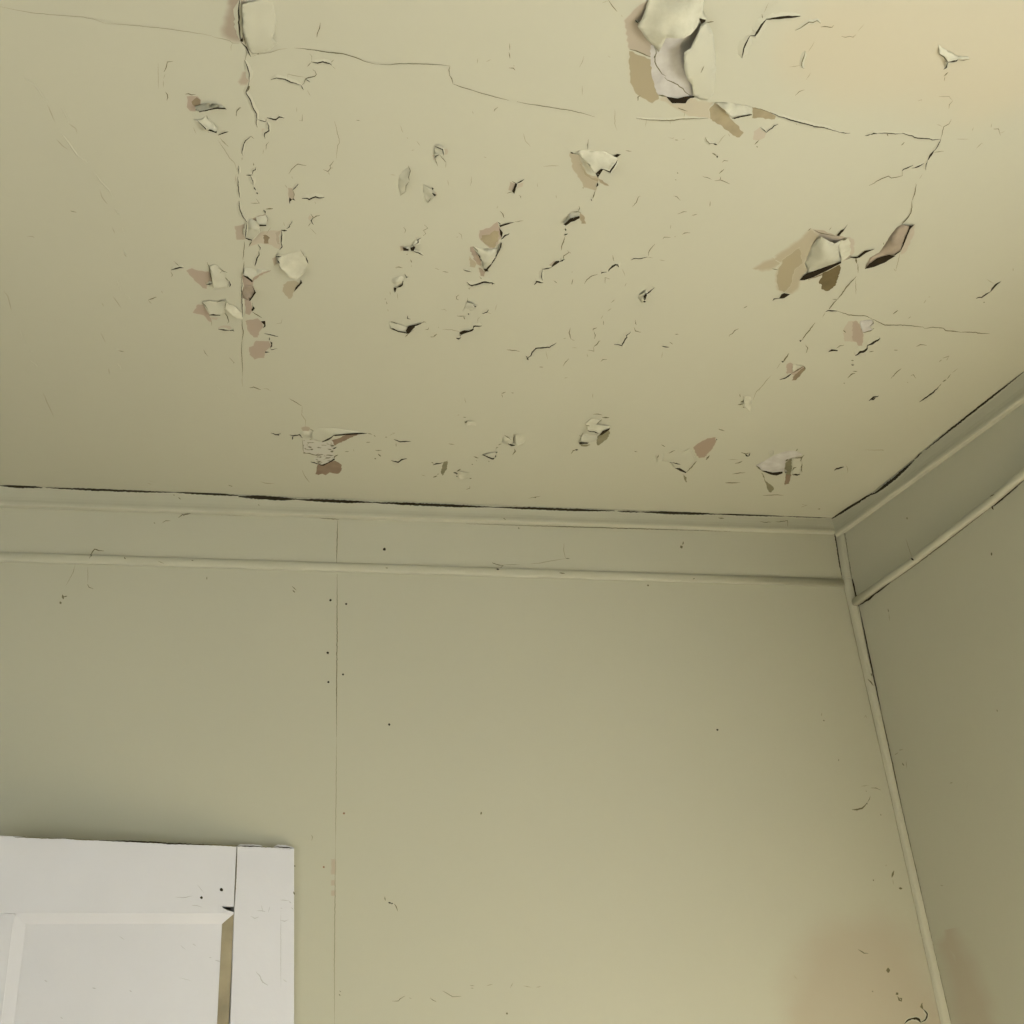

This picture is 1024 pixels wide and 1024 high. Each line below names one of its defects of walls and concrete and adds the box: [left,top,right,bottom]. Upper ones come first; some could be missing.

peeling [186,208,309,360]
crack [4,0,616,390]
peeling [469,206,519,276]
peeling [561,144,621,250]
peeling [623,0,778,147]
crack [672,136,730,184]
peeling [751,218,915,300]
crack [737,7,1003,221]
crack [753,277,988,399]
crack [976,280,1001,303]
peeling [290,426,370,475]
crack [0,370,1024,1024]